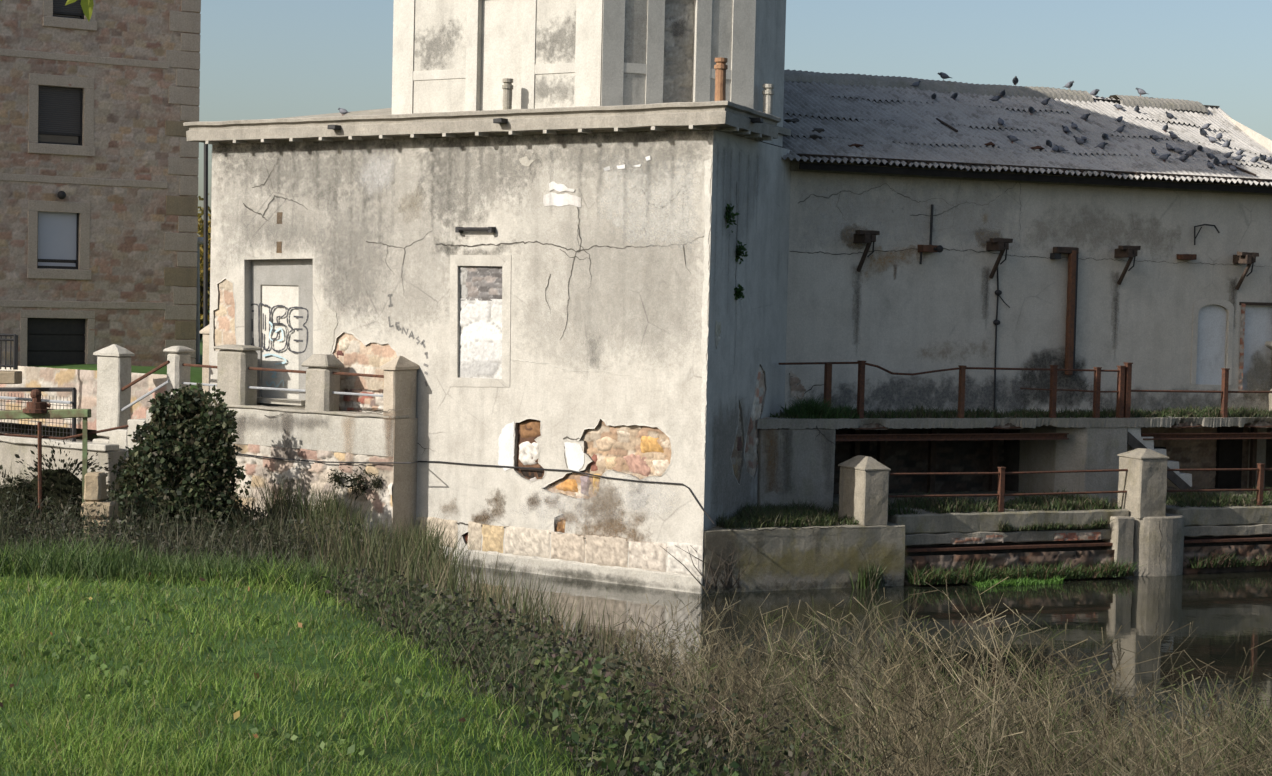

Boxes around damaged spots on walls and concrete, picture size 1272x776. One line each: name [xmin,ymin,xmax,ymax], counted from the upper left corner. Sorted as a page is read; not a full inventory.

crack [243,158,306,221]
crack [366,185,704,379]
flaking render [319,308,398,391]
leakage [807,352,1087,412]
flaking render [498,417,673,534]